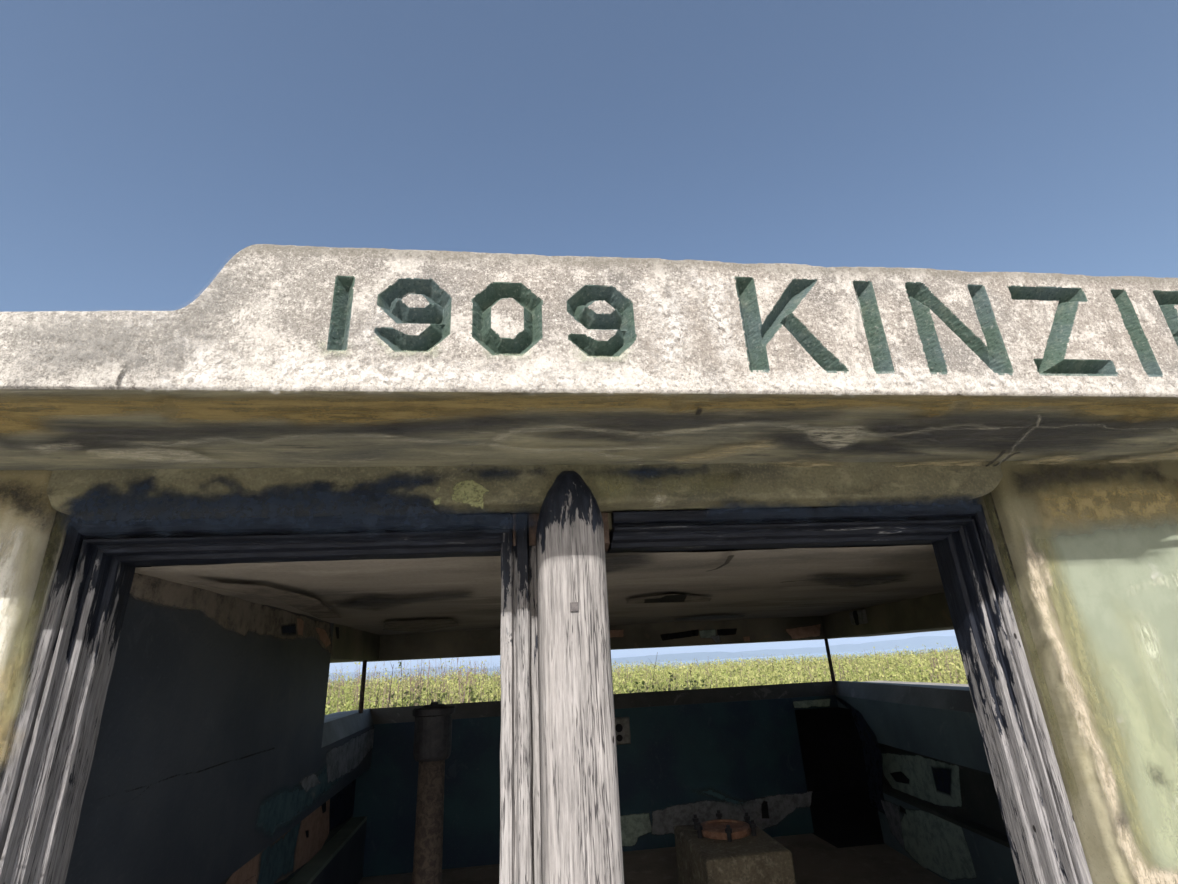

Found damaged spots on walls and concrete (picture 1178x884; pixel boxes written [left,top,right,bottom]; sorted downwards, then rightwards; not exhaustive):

leakage [37,427,351,461]
peeling [434,479,489,509]
leakage [543,414,1178,525]
crack [931,415,1071,467]
leakage [605,555,648,572]
leakage [0,474,536,726]
peeling [1026,522,1178,884]